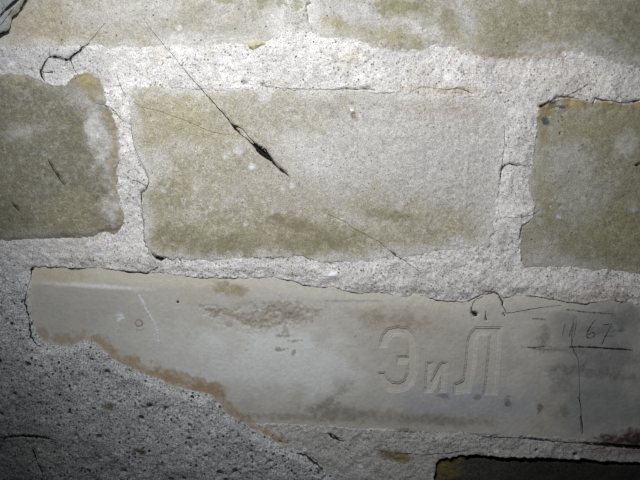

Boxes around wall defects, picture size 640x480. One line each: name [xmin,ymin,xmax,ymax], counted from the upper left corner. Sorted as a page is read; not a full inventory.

crack [40,31,98,81]
crack [116,19,290,178]
crack [262,83,374,91]
crack [329,214,421,273]
crack [21,267,41,347]
crack [471,291,562,320]